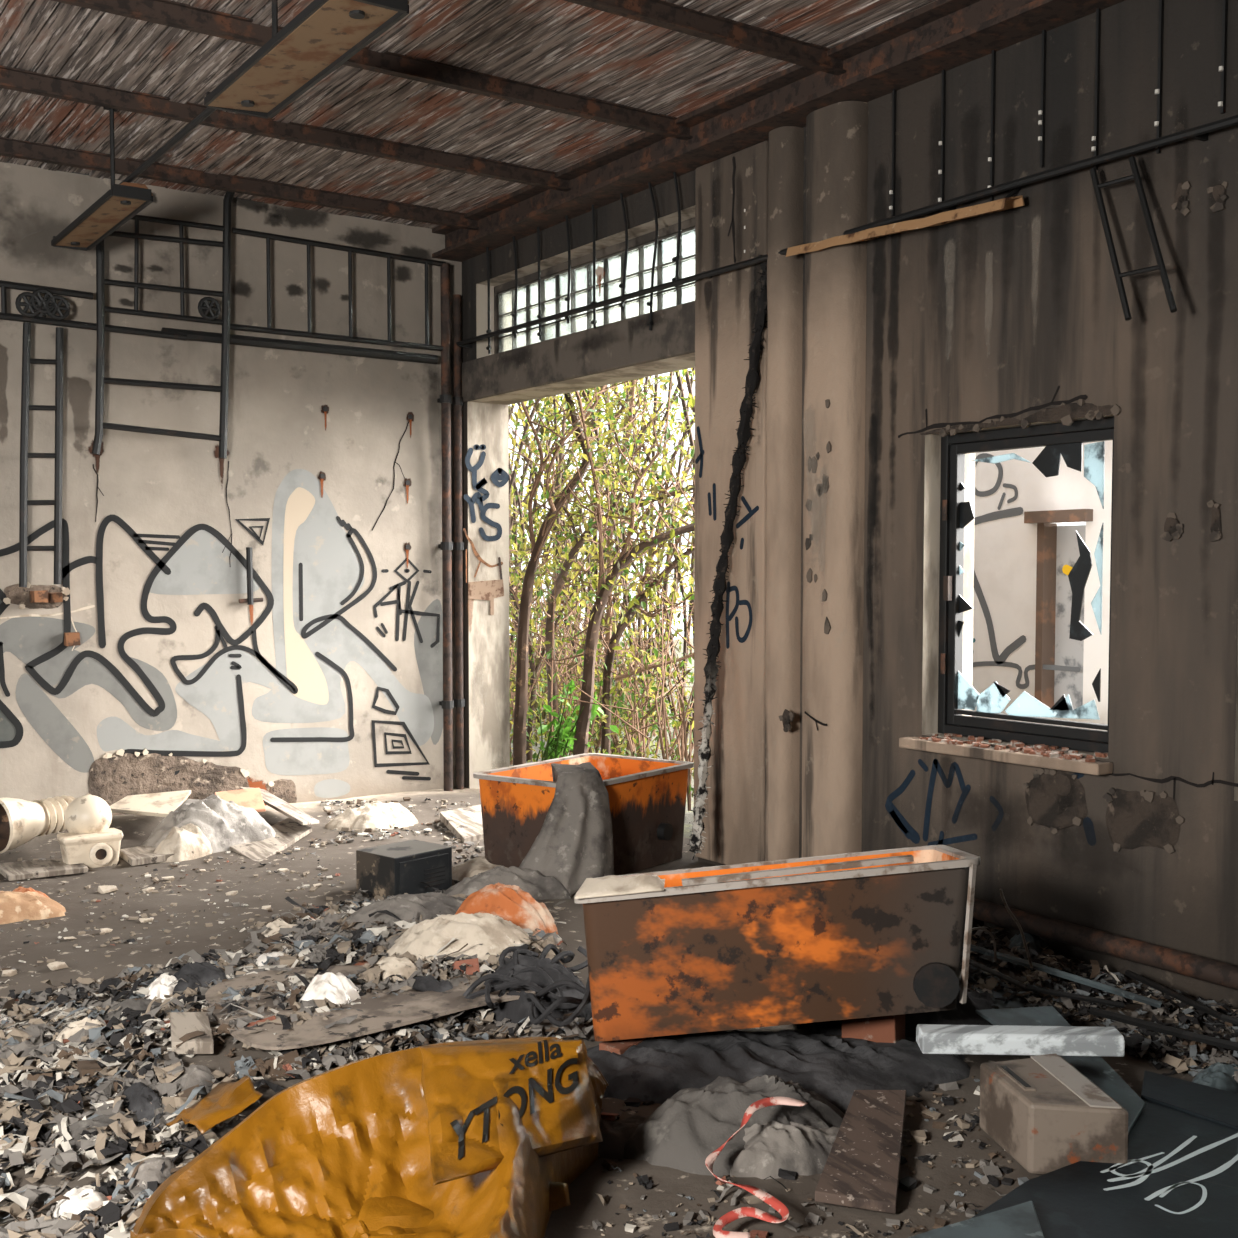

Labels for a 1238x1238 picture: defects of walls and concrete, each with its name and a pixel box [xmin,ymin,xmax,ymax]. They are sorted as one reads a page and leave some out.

crack [372,422,409,531]
crack [1109,772,1238,800]